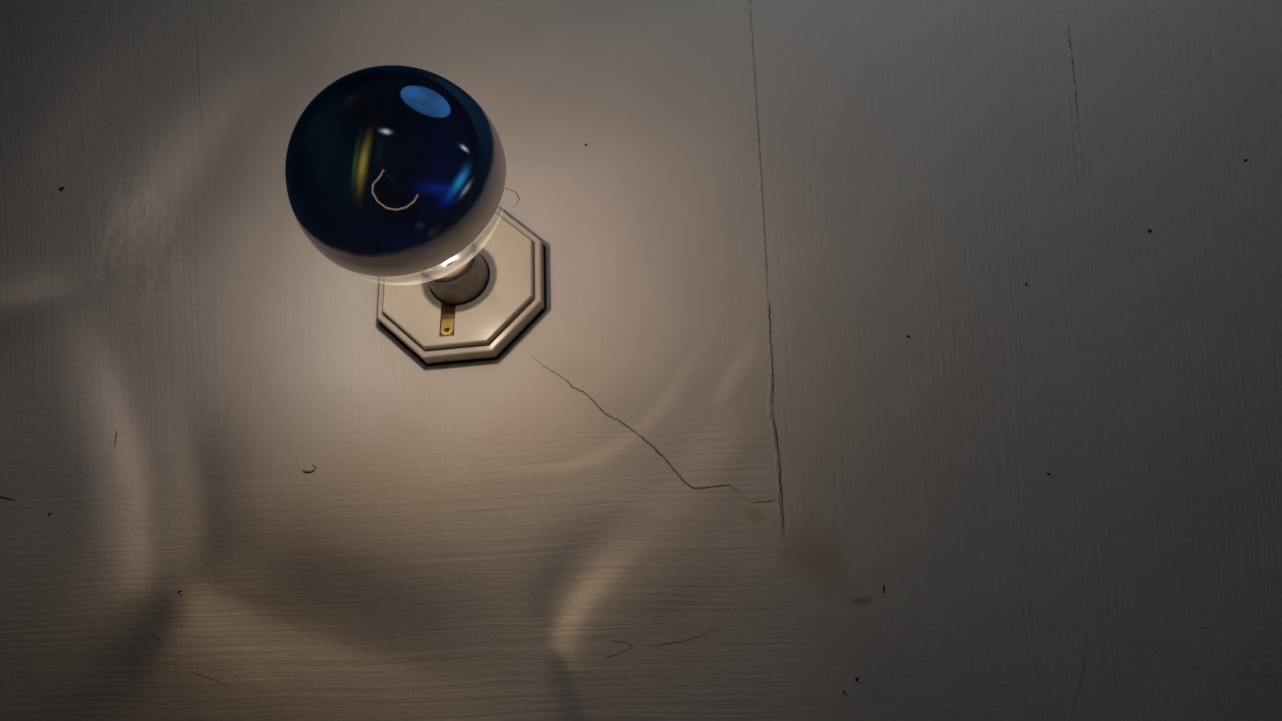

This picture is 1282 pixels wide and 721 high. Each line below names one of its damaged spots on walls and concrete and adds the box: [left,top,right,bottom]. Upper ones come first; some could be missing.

crack [528,0,785,533]